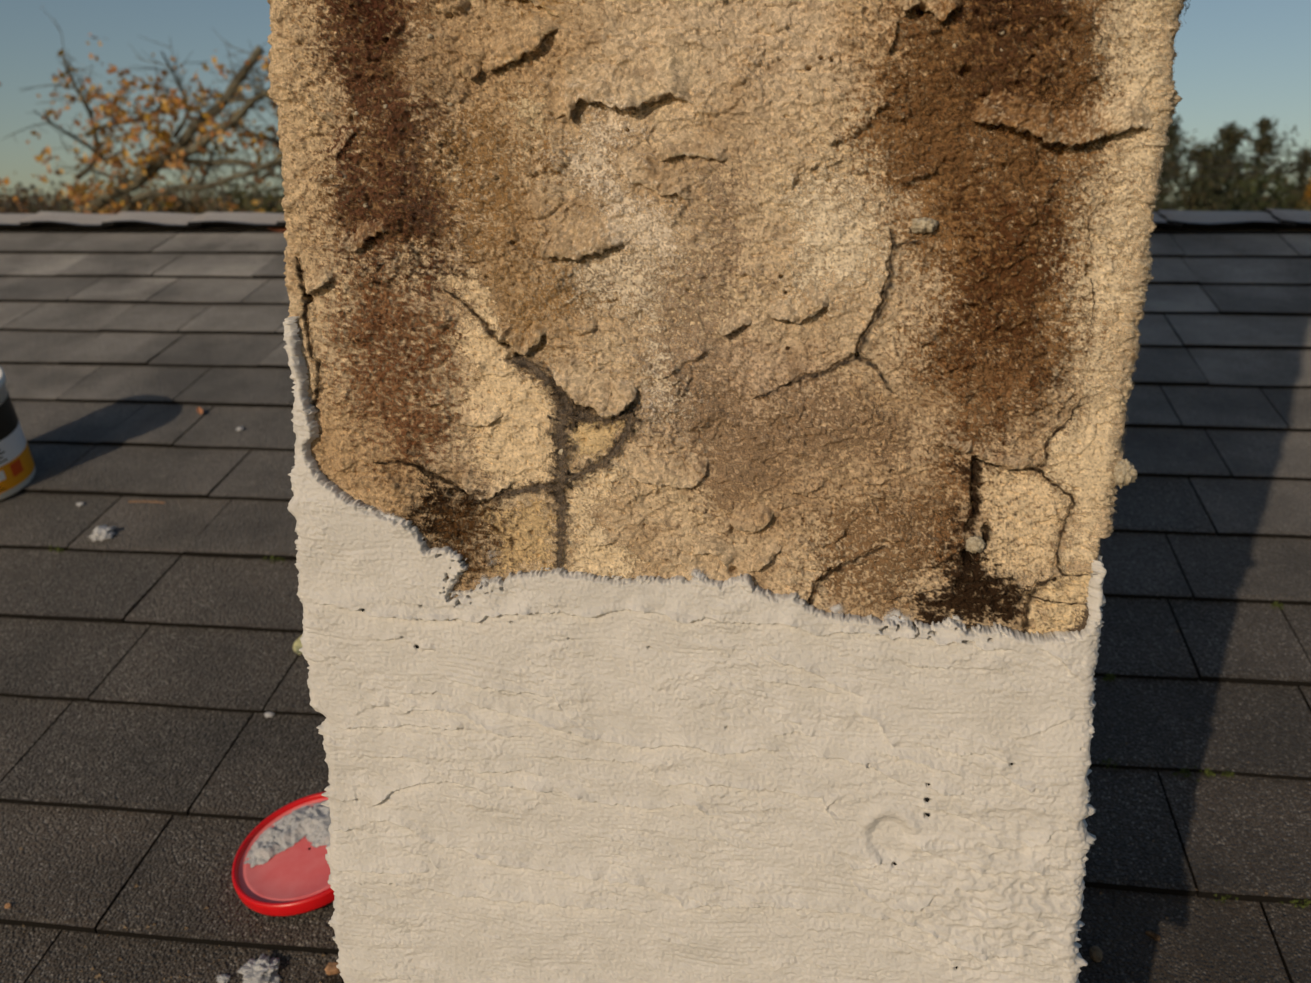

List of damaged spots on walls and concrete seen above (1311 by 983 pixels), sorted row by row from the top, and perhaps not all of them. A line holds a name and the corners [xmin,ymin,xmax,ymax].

peeling [461,0,574,80]
peeling [897,0,965,22]
peeling [543,45,700,120]
peeling [969,82,1155,147]
peeling [618,129,728,200]
peeling [539,210,629,261]
crack [295,256,320,406]
leakage [289,0,1190,629]
crack [751,228,921,400]
crack [372,289,639,568]
crack [884,395,1097,633]
crack [809,545,885,605]